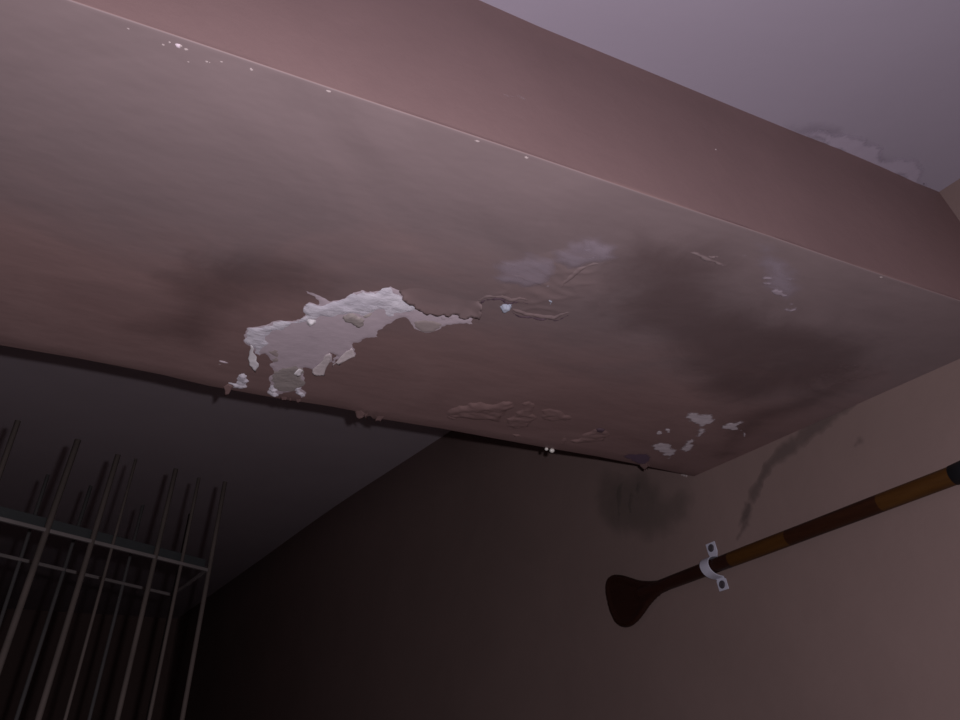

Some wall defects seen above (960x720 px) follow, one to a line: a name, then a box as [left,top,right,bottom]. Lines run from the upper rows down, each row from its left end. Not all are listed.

peeling [224,287,483,403]
leakage [625,413,746,464]